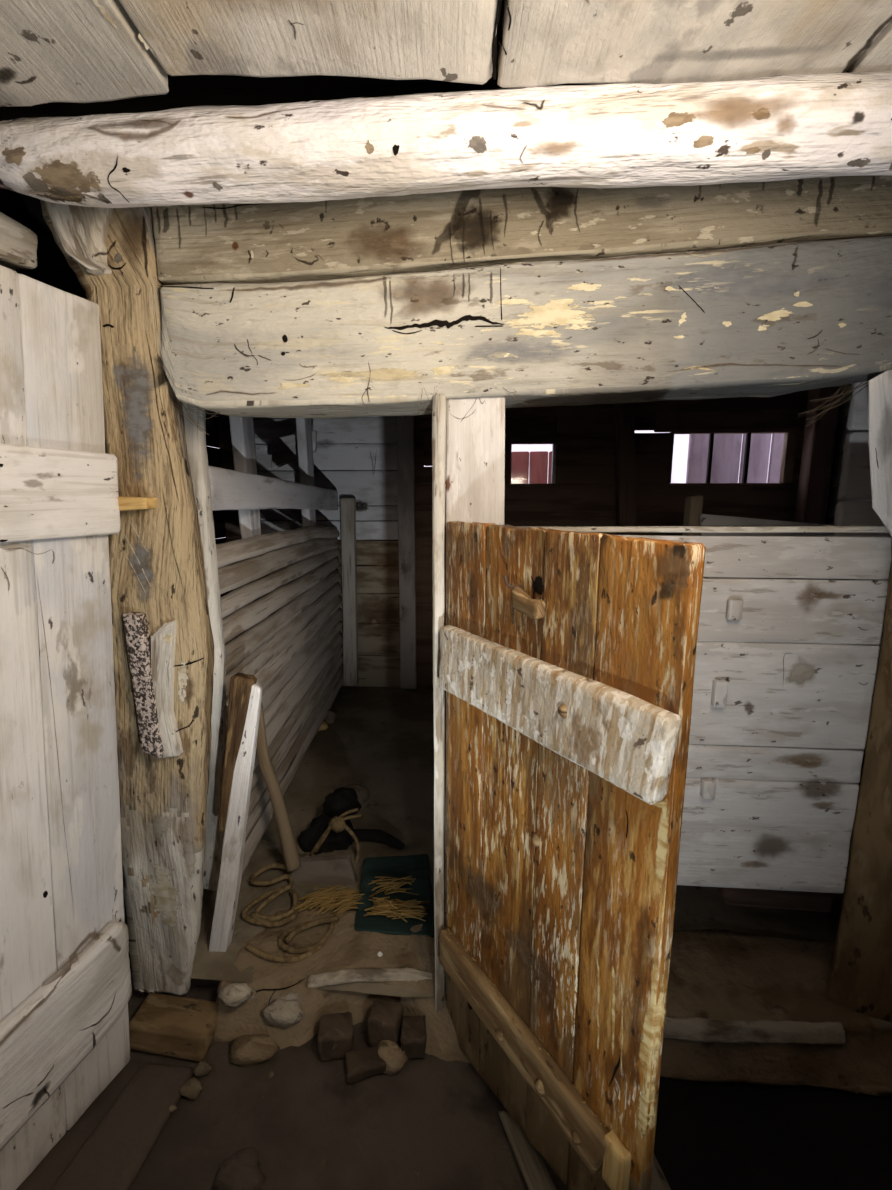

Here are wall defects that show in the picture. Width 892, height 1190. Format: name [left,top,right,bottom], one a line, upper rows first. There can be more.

crack [385,267,504,334]
peeling [495,283,602,337]
peeling [660,544,688,598]
peeling [649,801,669,889]
peeling [637,962,665,1134]